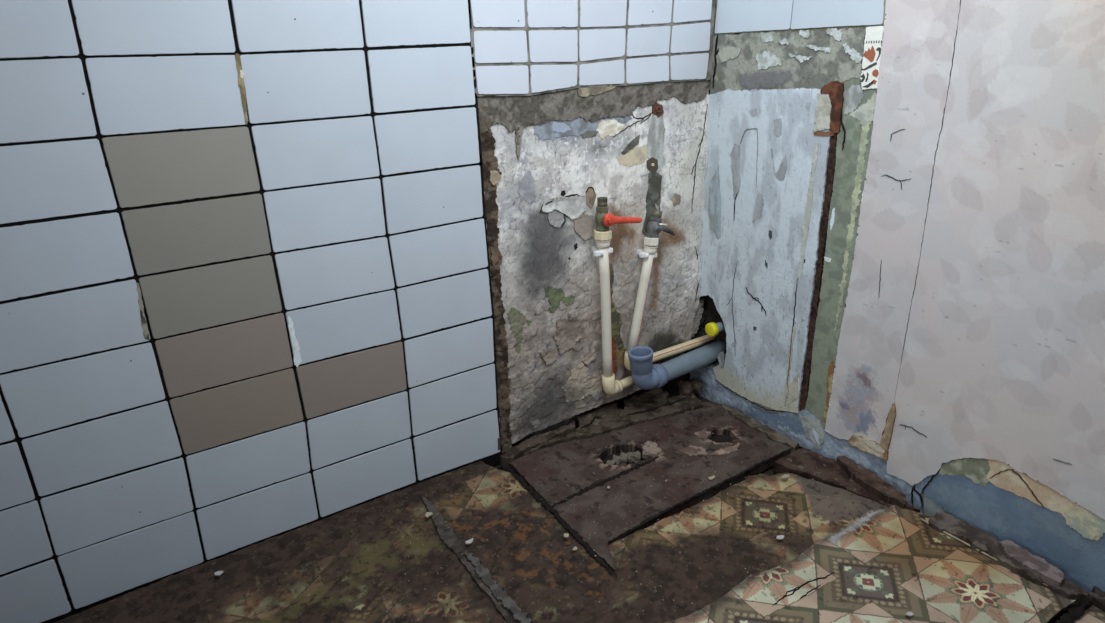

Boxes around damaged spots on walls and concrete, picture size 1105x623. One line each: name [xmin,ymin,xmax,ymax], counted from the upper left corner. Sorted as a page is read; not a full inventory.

damp [524,211,561,293]
crack [691,34,719,204]
peeling [477,28,1105,592]
rust [799,81,846,411]